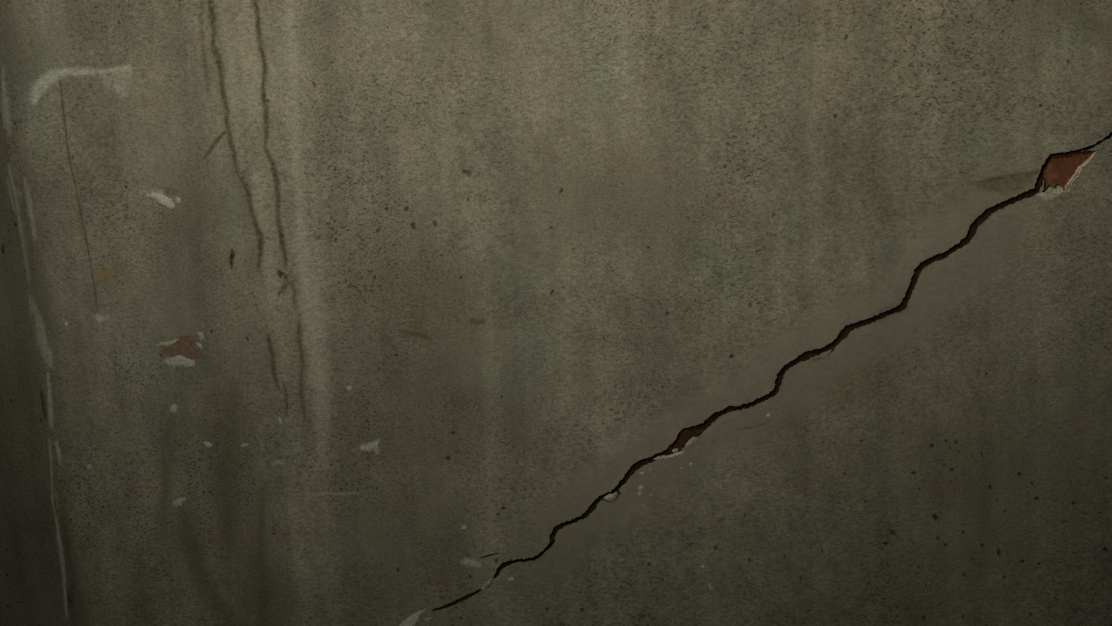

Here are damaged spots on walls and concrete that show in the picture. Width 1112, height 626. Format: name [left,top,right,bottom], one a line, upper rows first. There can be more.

spalling [1036,150,1098,203]
peeling [157,332,204,368]
crack [432,132,1112,611]